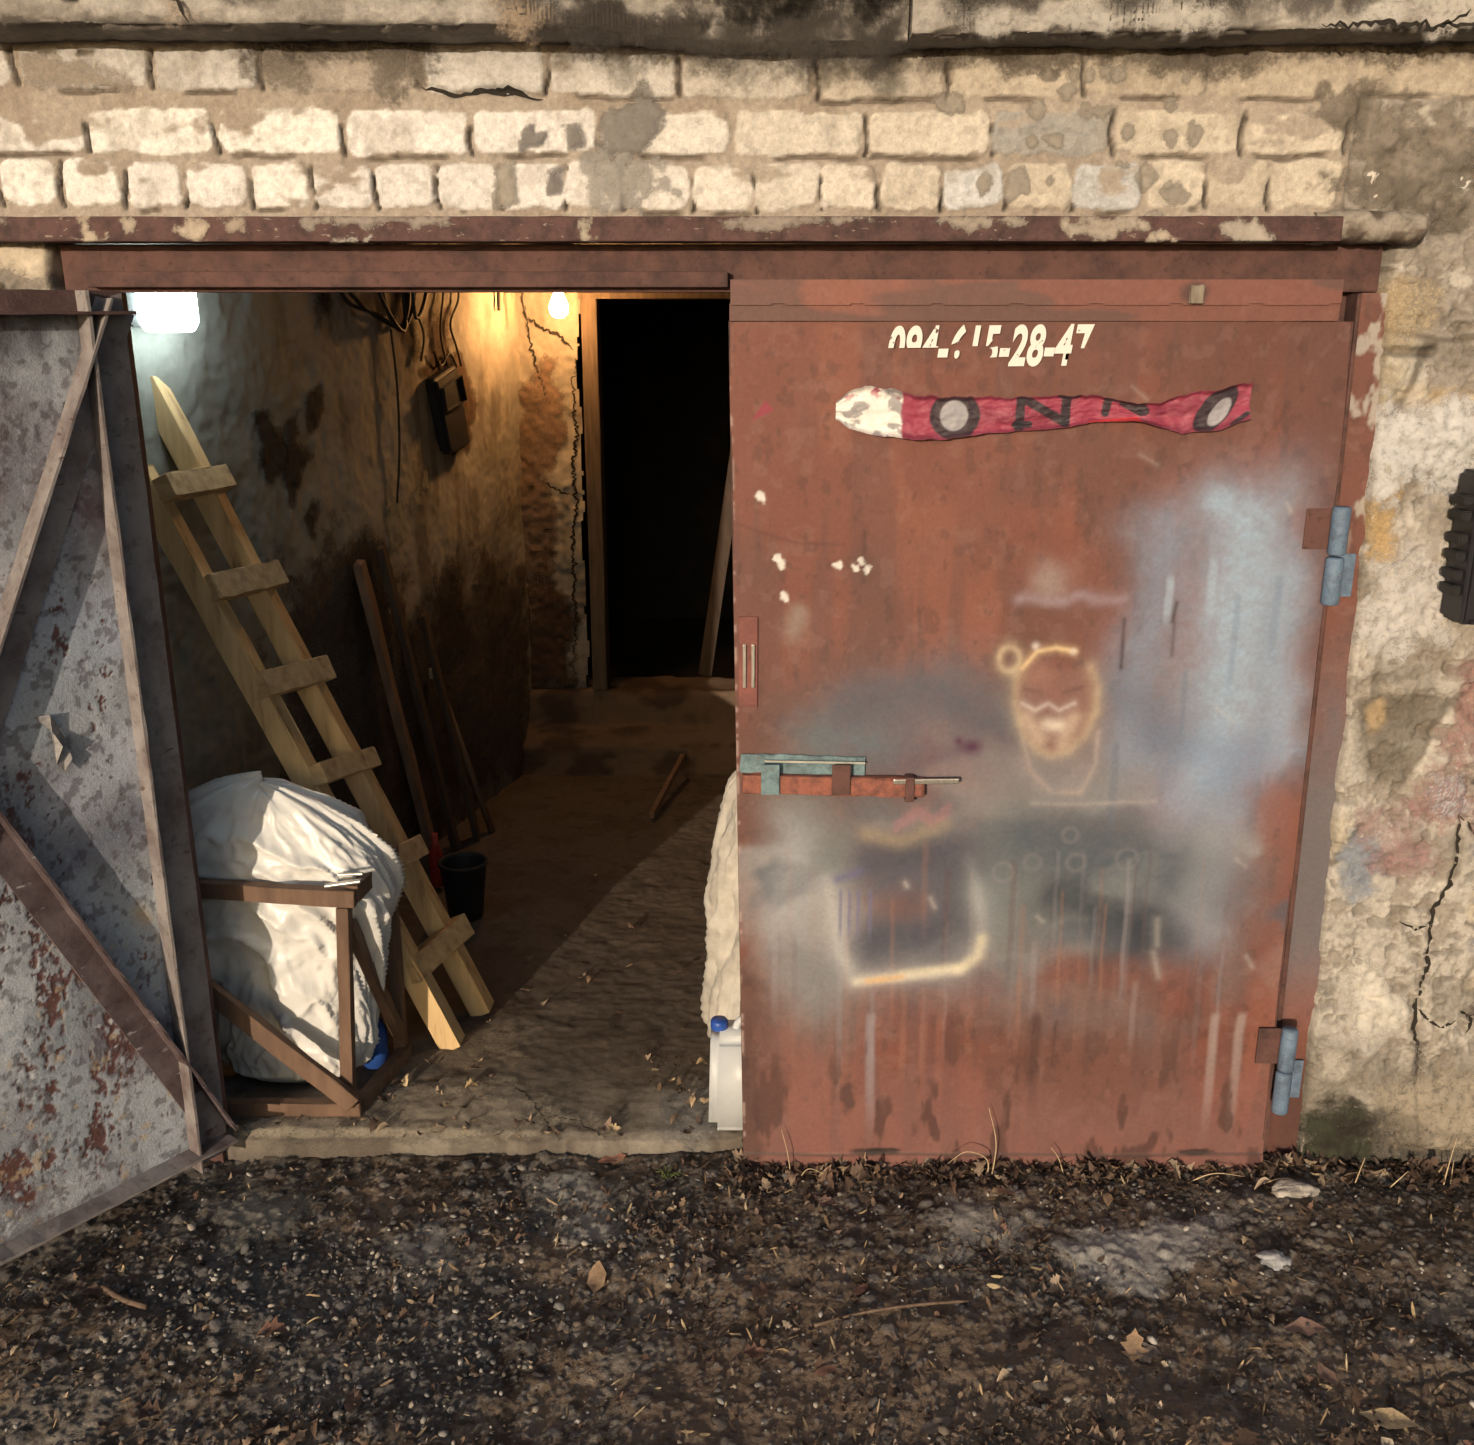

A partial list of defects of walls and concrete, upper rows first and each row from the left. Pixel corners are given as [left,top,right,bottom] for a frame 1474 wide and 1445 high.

crack [175,0,190,24]
peeling [77,216,137,241]
peeling [173,217,245,241]
peeling [300,216,450,242]
peeling [578,217,592,241]
peeling [723,216,872,232]
peeling [937,216,1028,234]
peeling [1060,216,1177,241]
peeling [1219,217,1276,241]
leakage [251,384,531,838]
crack [1400,782,1474,1085]